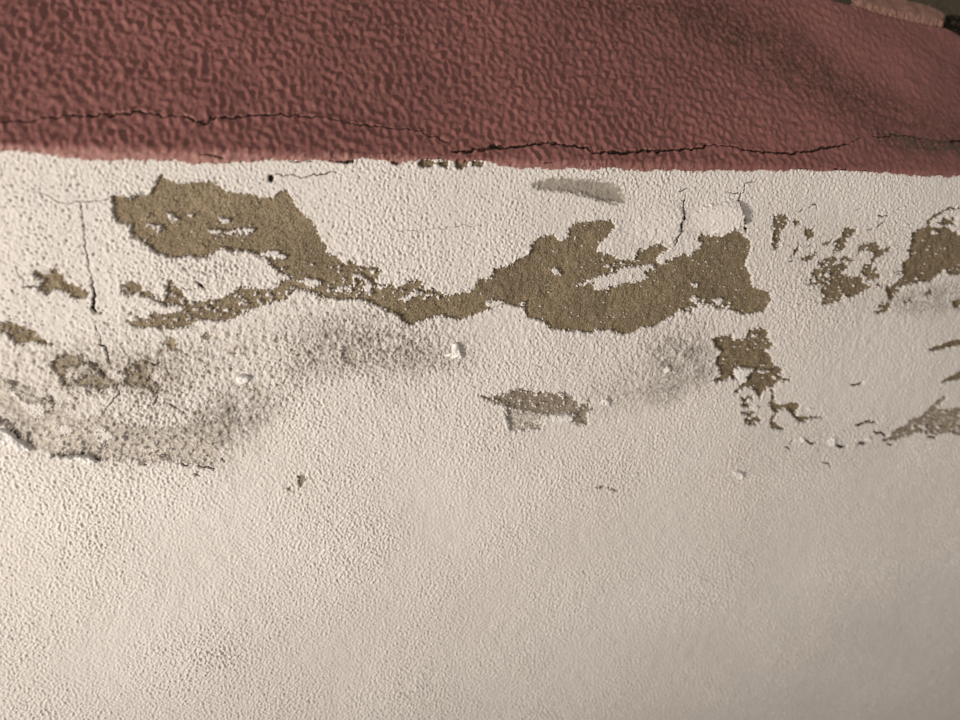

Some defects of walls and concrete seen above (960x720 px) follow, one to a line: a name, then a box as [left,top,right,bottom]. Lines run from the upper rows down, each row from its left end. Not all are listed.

crack [1,110,960,163]
crack [674,188,687,246]
flaking render [34,268,89,299]
crack [31,187,120,413]
flaking render [112,174,771,350]
flaking render [772,206,960,315]
flaking render [0,321,160,398]
flaking render [481,388,611,430]
flaking render [711,328,820,431]
flaking render [886,396,960,440]